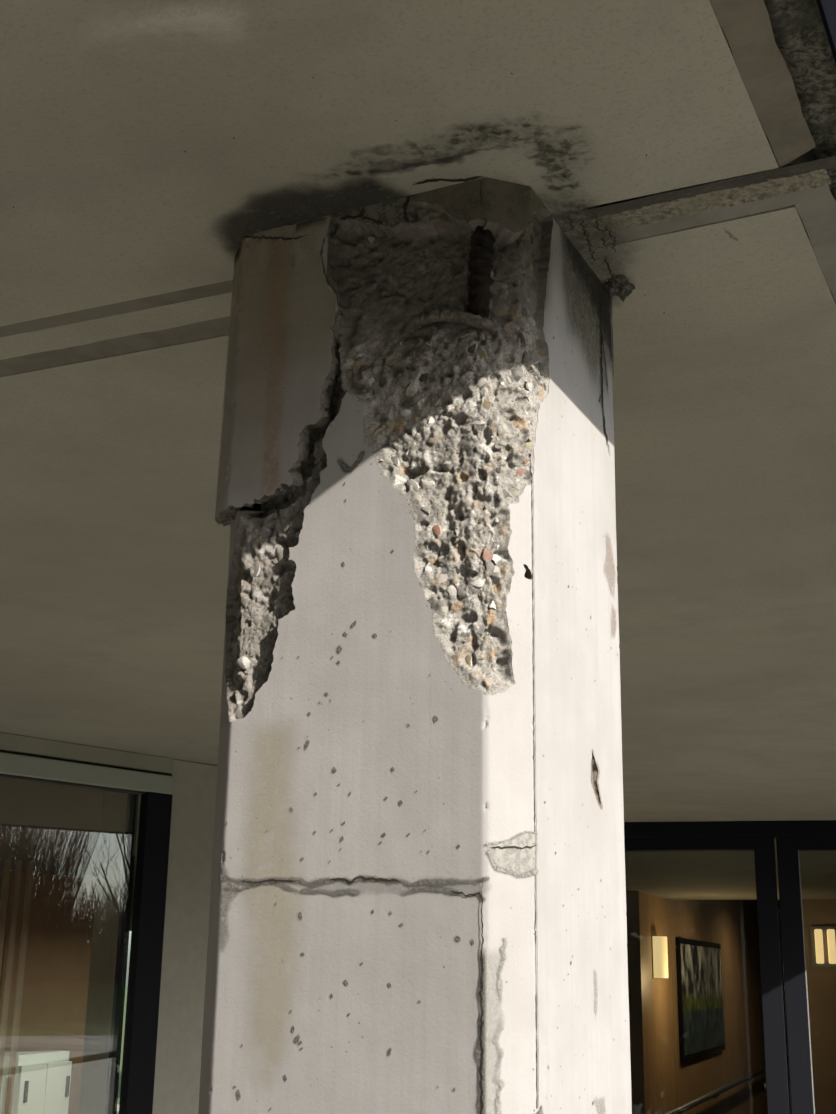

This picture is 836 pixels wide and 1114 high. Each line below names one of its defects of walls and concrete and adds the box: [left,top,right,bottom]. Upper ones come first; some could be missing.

water stain [223,125,576,264]
water stain [540,200,623,294]
crack [596,275,610,452]
crack [338,451,365,473]
spalling [225,200,561,722]
peeling [486,831,538,878]
crack [531,450,539,1108]
crack [219,875,507,1114]